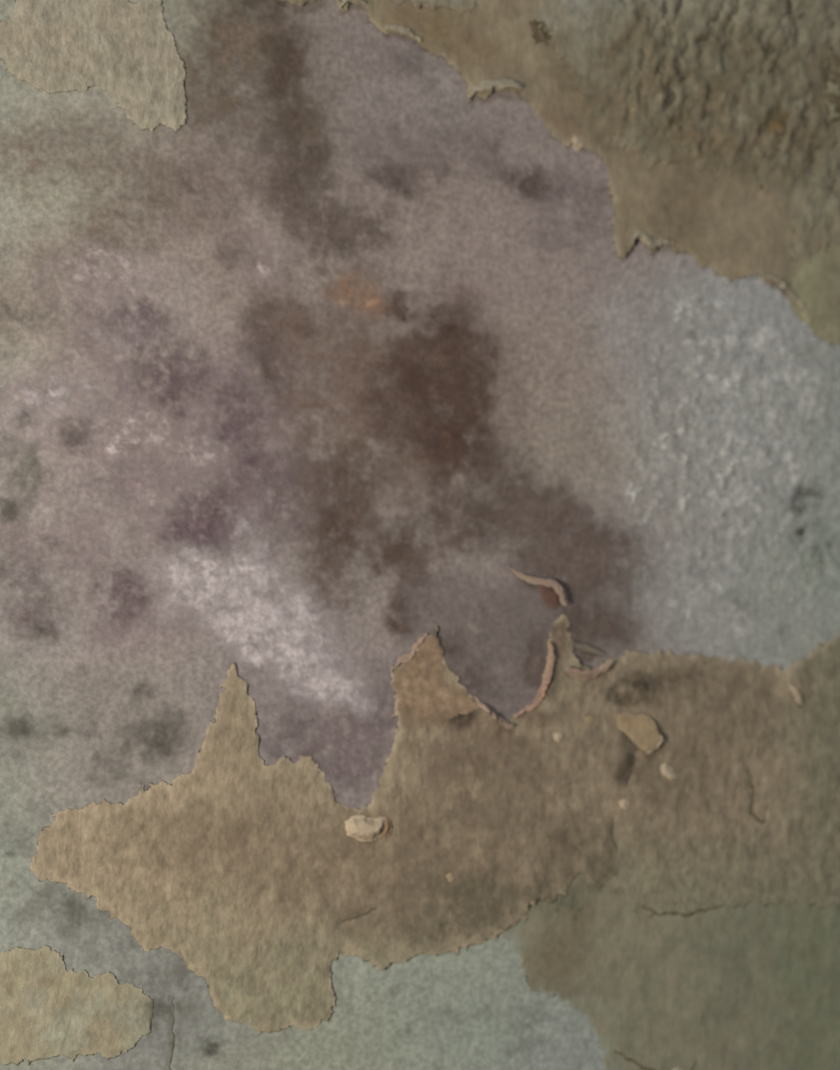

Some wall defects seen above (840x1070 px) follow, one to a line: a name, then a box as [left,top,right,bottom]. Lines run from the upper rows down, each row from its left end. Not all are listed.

water stain [185,0,387,251]
peeling [335,0,840,345]
crack [664,0,835,147]
water stain [2,386,67,489]
water stain [65,196,647,782]
water stain [644,275,831,659]
peeling [30,567,840,1034]
crack [640,905,723,917]